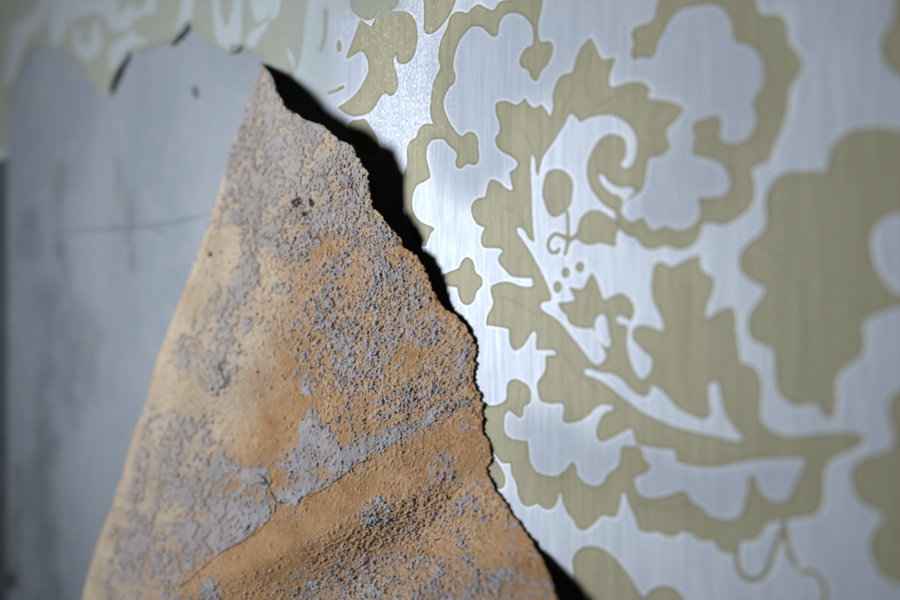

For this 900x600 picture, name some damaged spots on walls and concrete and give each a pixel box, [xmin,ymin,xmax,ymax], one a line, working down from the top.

flaking render [8,27,452,600]
peeling [299,553,516,600]